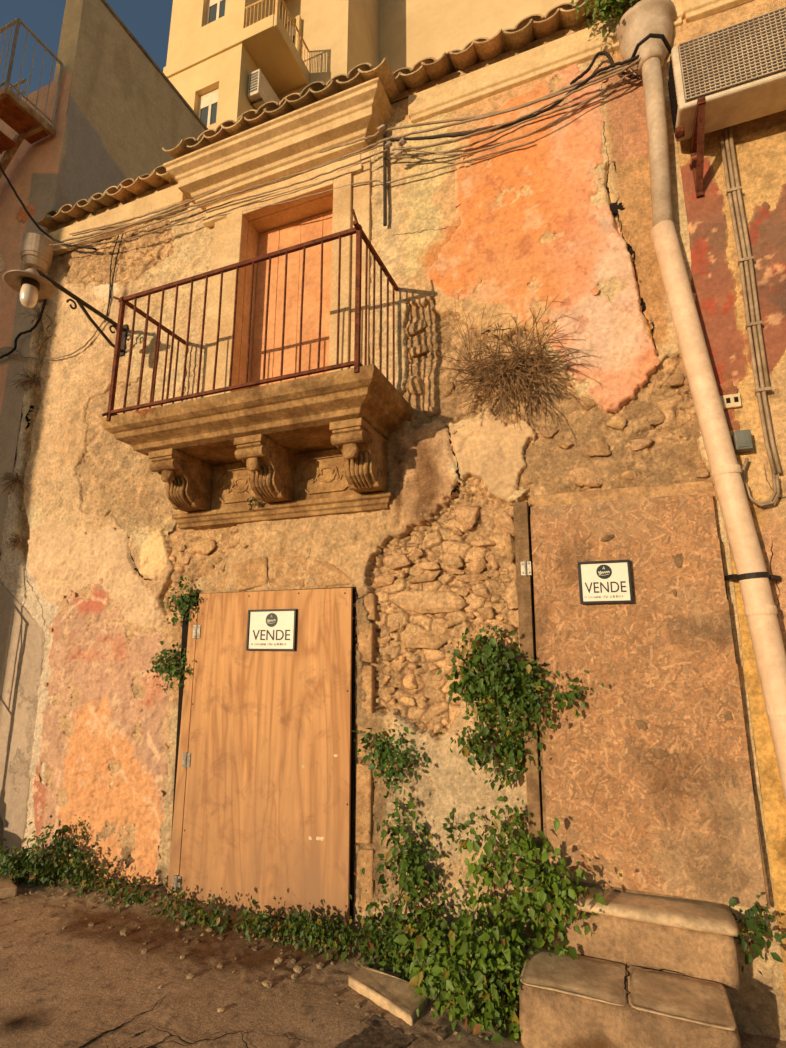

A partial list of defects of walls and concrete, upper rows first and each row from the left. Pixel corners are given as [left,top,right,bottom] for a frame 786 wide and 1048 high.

crack [596,58,661,366]
peeling [680,155,786,396]
crack [445,425,461,500]
peeling [368,60,713,738]
peeling [724,408,740,432]
peeling [31,578,172,888]
crack [67,994,316,1048]